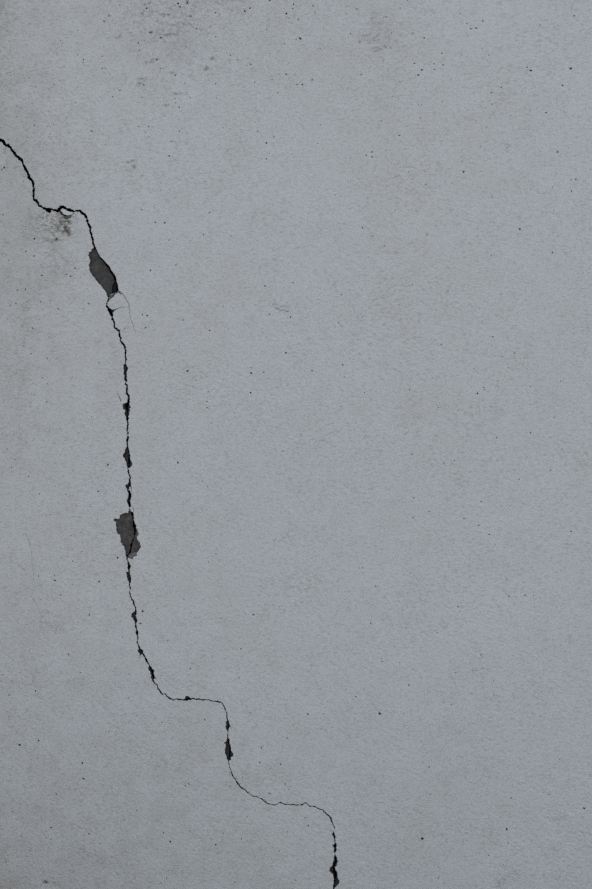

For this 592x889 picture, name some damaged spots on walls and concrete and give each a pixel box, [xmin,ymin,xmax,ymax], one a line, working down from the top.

spalling [88,248,122,315]
spalling [114,482,141,582]
crack [0,138,337,889]